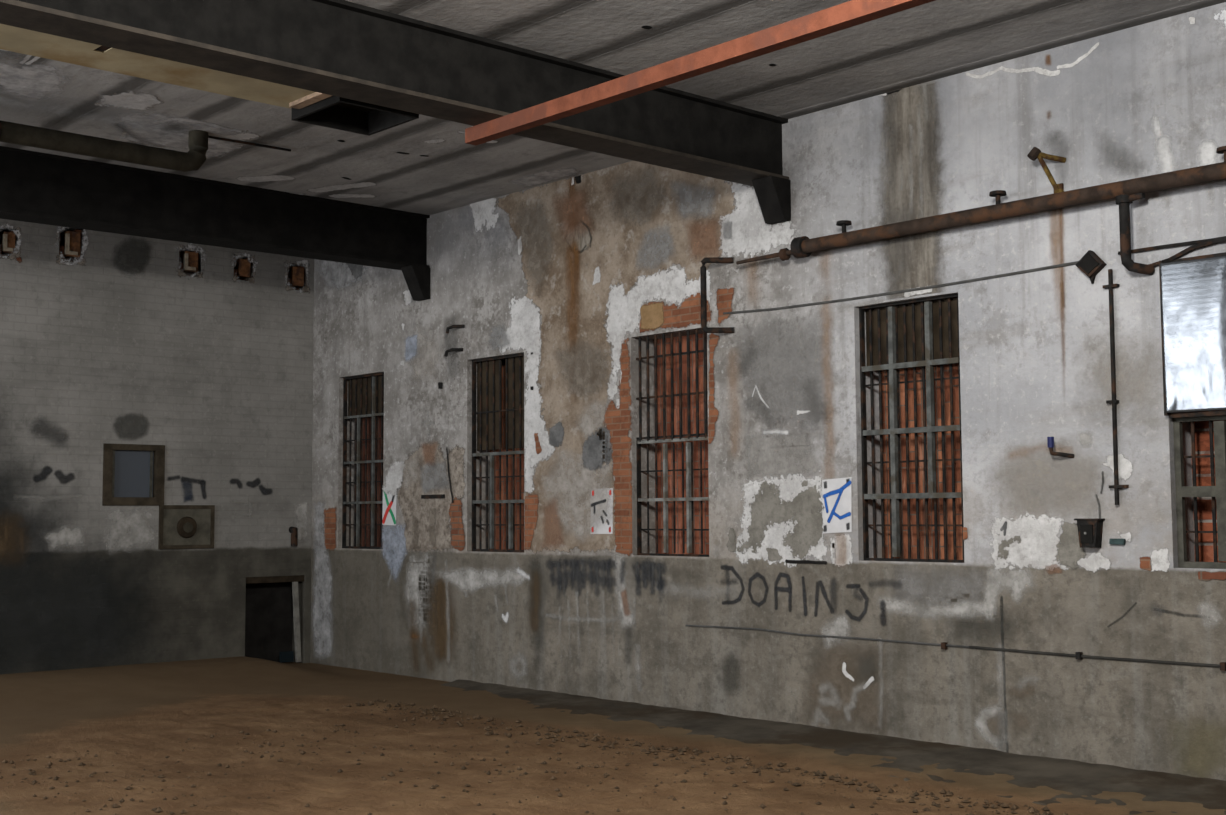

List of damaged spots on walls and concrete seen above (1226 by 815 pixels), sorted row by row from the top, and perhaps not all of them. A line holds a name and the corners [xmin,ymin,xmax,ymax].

peeling [1214,9,1226,28]
leakage [882,82,941,298]
spalling [0,224,22,263]
hole [56,226,89,266]
spalling [177,243,205,278]
spalling [231,253,258,283]
rust [568,242,578,337]
rust [1056,209,1064,307]
flaking render [470,161,735,633]
peeling [727,470,827,568]
peeling [989,511,1111,572]